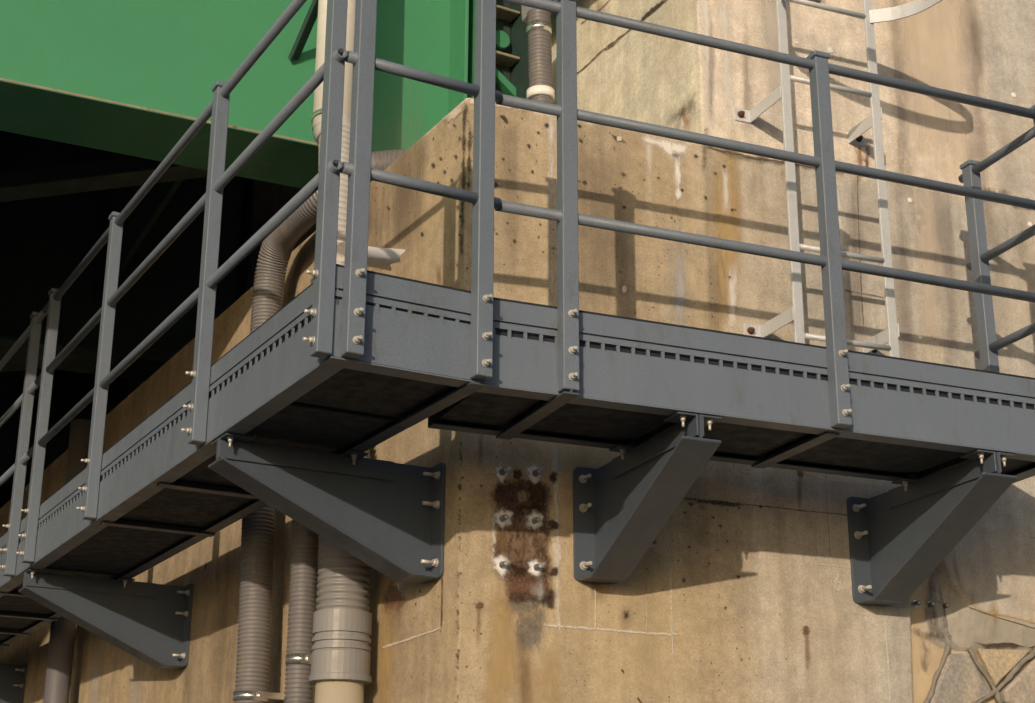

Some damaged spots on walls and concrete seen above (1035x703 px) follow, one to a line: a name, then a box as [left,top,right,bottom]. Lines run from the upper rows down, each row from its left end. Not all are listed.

crack [577,0,666,74]
water stain [643,137,687,200]
corrosion [492,469,559,644]